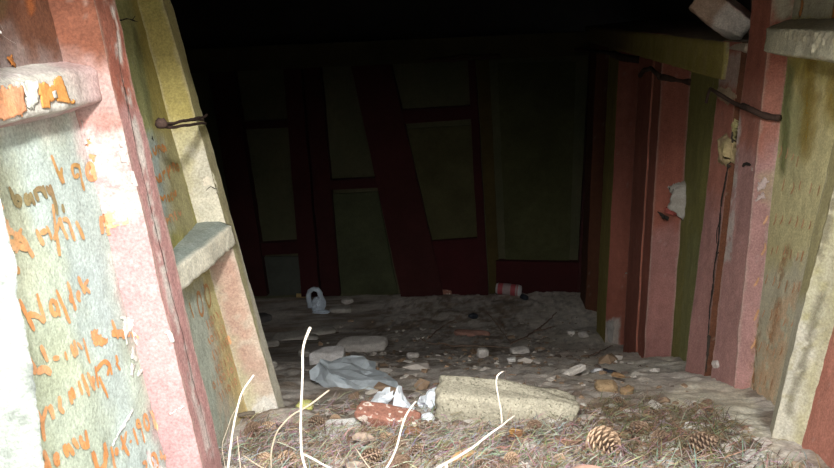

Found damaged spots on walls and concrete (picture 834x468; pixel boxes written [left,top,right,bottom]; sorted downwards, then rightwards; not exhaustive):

peeling [0,76,76,121]
damp [781,66,792,171]
damp [802,60,815,149]
crack [705,132,735,372]